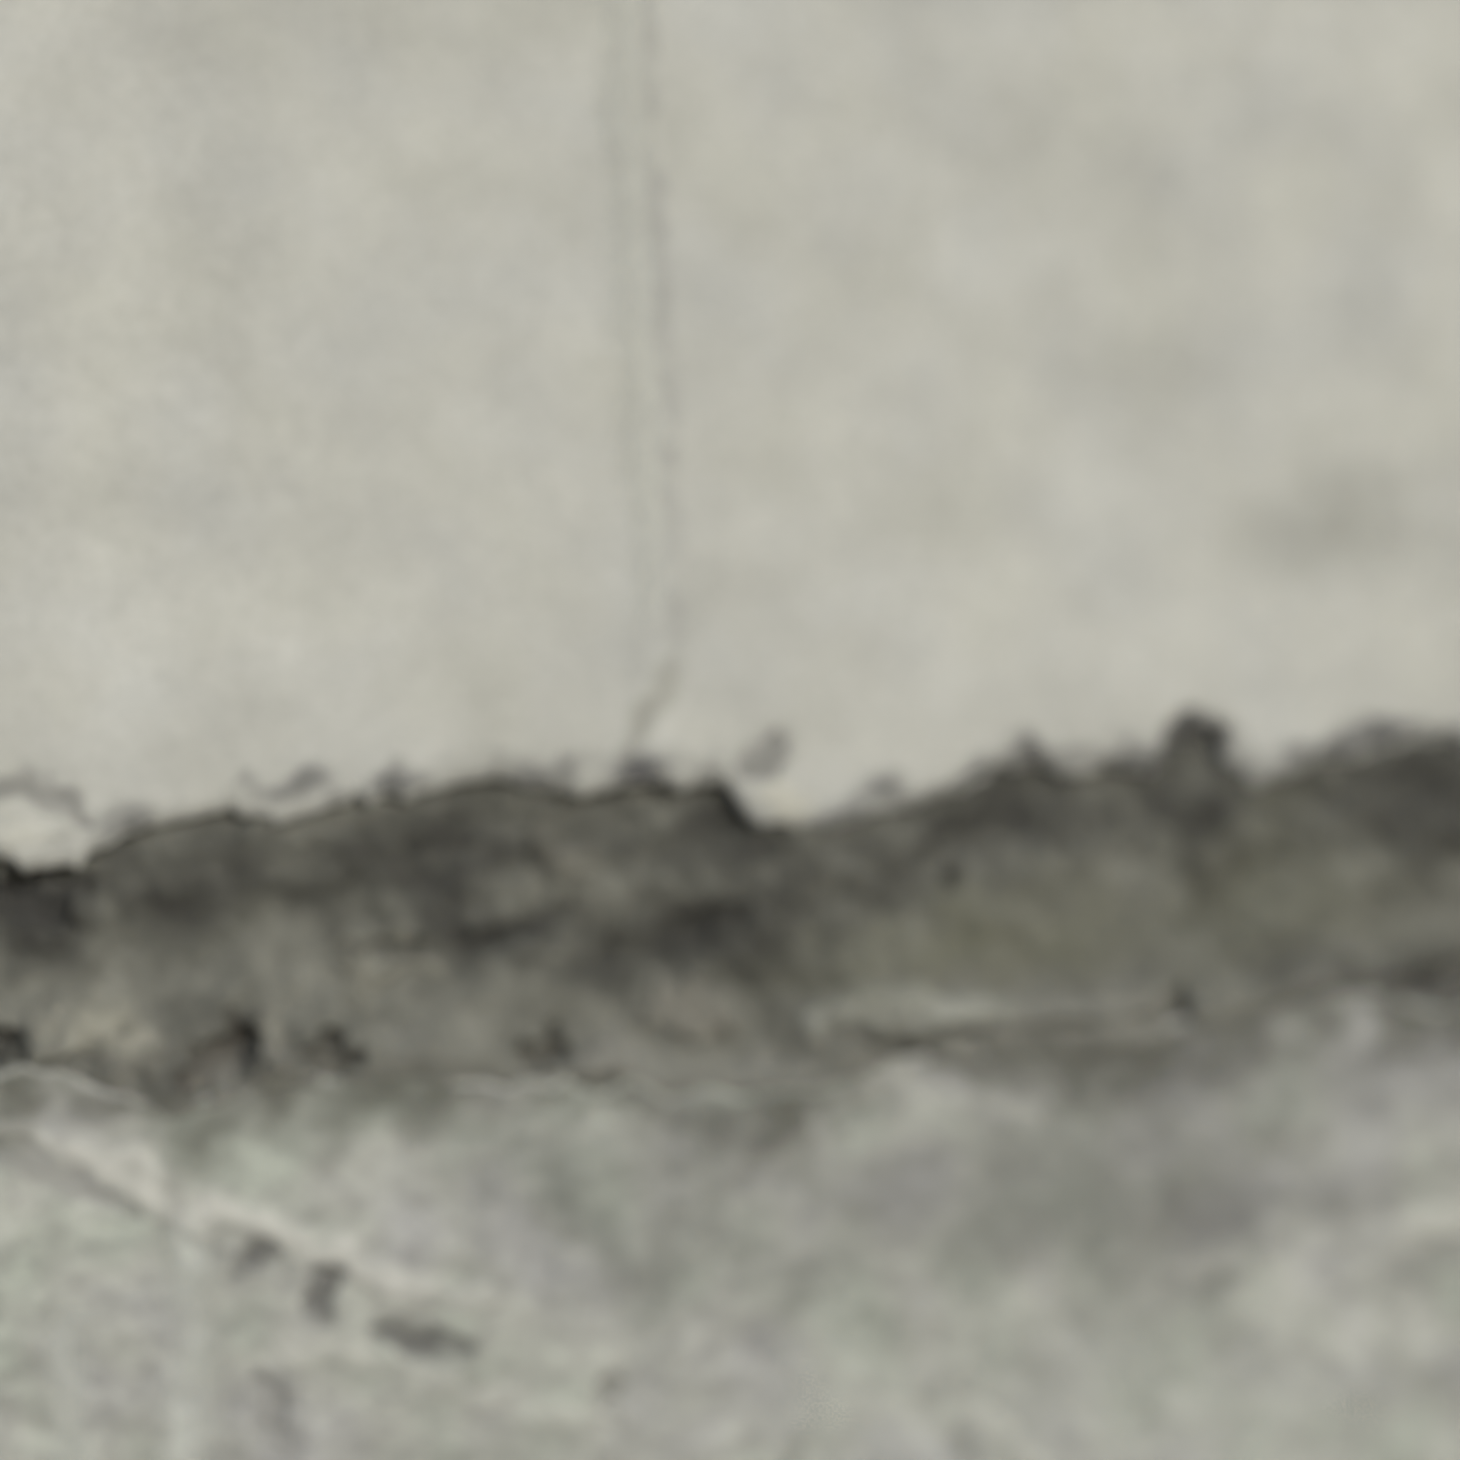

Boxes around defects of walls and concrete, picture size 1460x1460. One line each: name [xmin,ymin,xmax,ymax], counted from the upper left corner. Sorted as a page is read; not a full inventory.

spalling [0,765,95,850]
spalling [733,728,816,826]
spalling [975,708,1237,778]